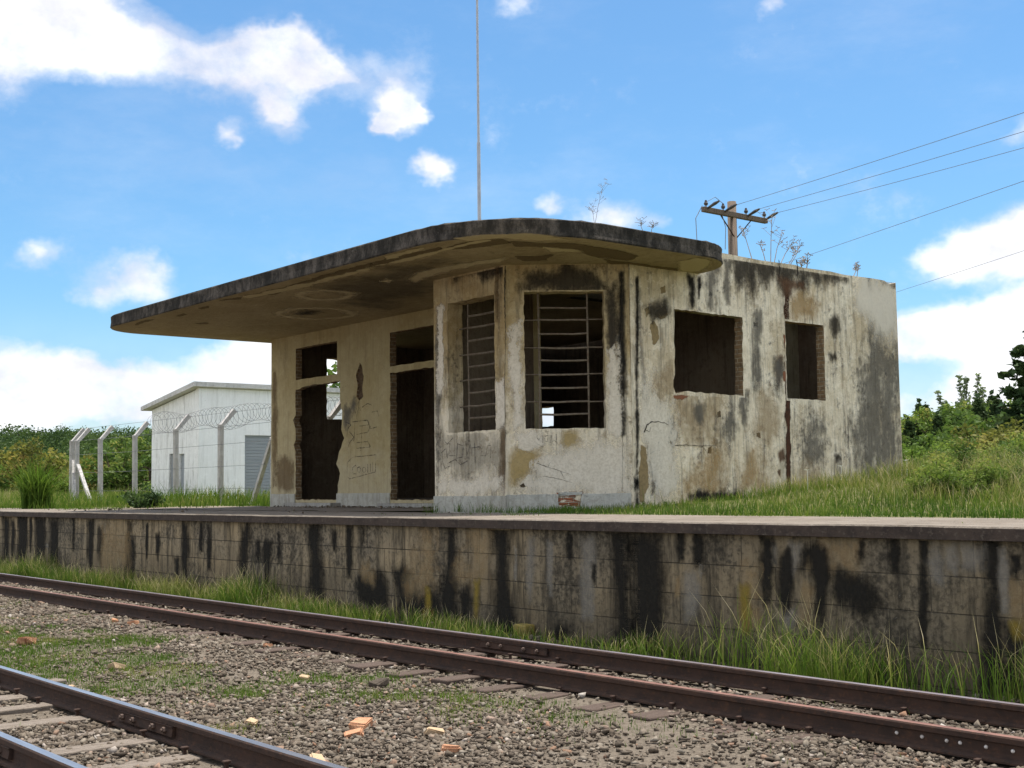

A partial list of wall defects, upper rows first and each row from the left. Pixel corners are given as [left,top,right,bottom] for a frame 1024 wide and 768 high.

water stain [687,260,848,319]
peeling [436,304,445,394]
peeling [437,318,688,507]
water stain [521,265,668,507]
crack [617,275,716,488]
rust [776,343,791,491]
water stain [849,326,902,479]
water stain [3,517,58,568]
water stain [124,521,161,578]
water stain [174,521,211,582]
water stain [239,523,280,585]
water stain [740,536,879,631]